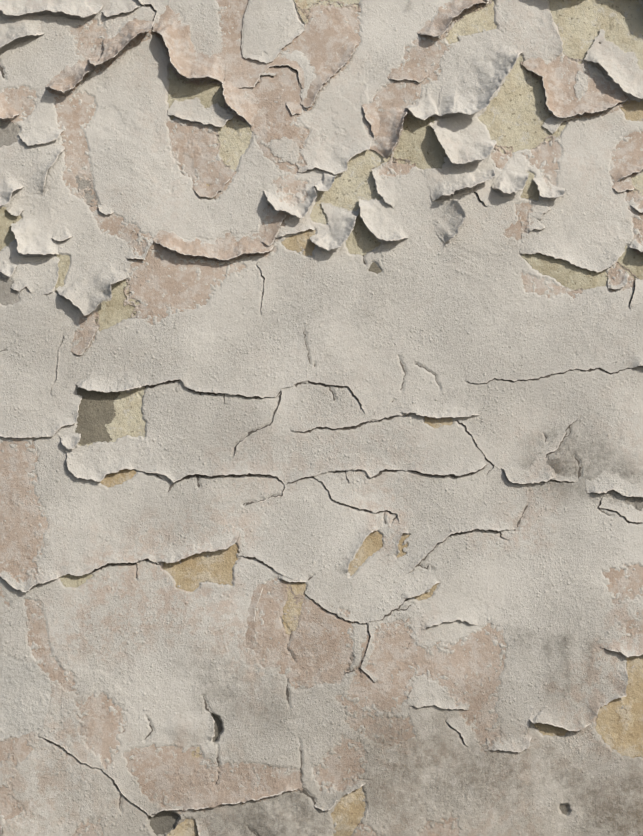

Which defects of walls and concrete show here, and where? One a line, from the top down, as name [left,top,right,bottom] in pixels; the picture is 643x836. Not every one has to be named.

peeling [0,0,643,356]
peeling [397,392,480,428]
crack [466,343,643,384]
peeling [0,363,146,574]
crack [0,531,170,593]
crack [66,328,577,682]
peeling [329,512,410,576]
peeling [585,464,643,524]
peeling [0,523,643,836]
crack [39,722,157,817]